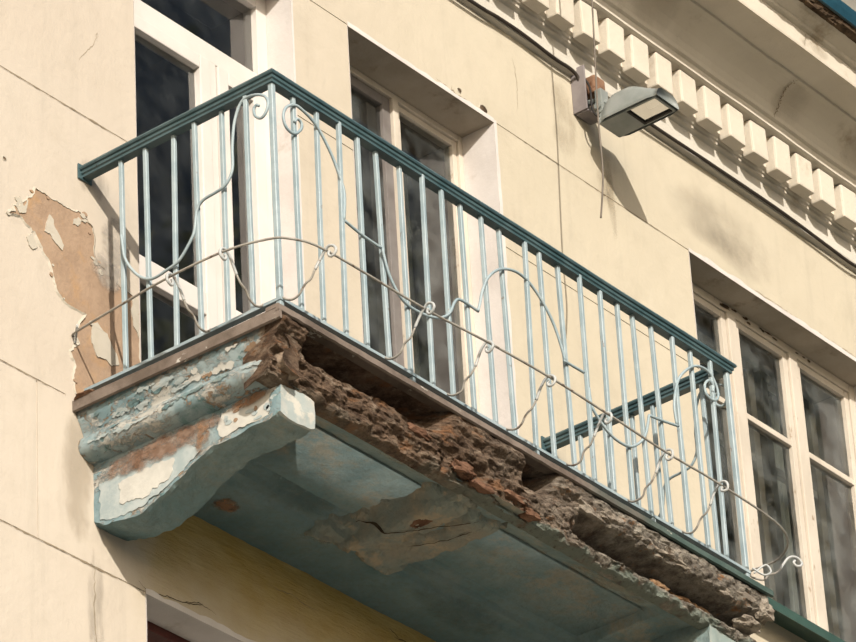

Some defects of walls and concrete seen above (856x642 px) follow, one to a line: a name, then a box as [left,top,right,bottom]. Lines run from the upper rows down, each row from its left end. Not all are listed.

flaking render [6,187,140,394]
crack [0,519,216,642]
crack [356,520,481,547]
spalling [87,314,775,642]